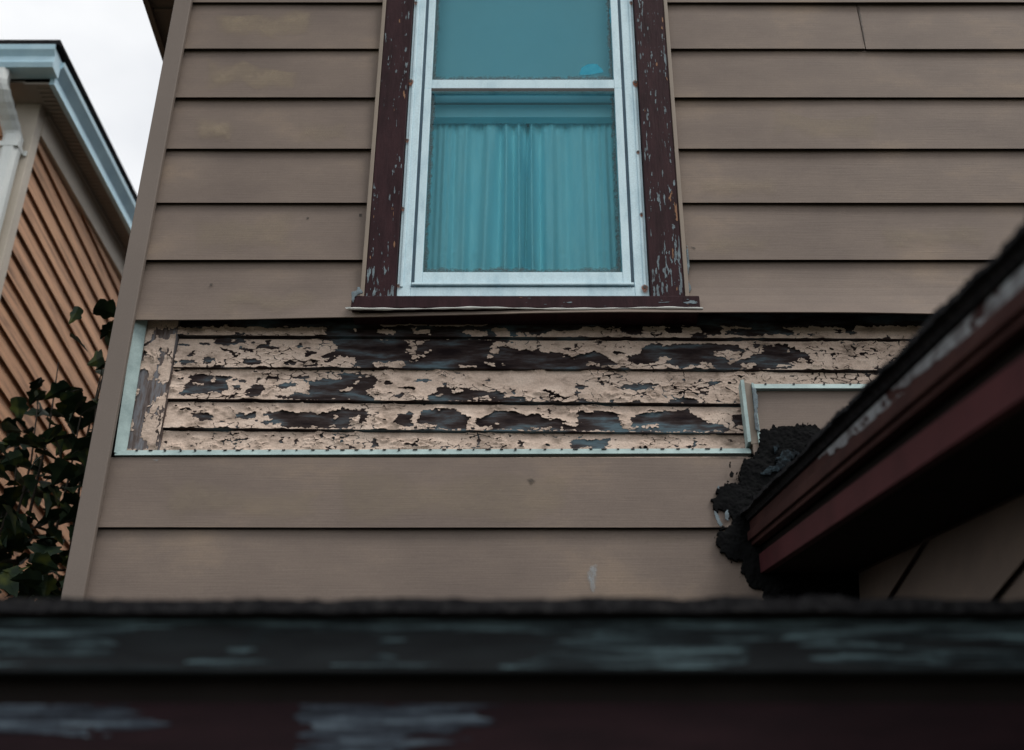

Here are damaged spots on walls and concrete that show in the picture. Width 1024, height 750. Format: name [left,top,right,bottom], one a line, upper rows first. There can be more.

peeling [127,0,932,458]